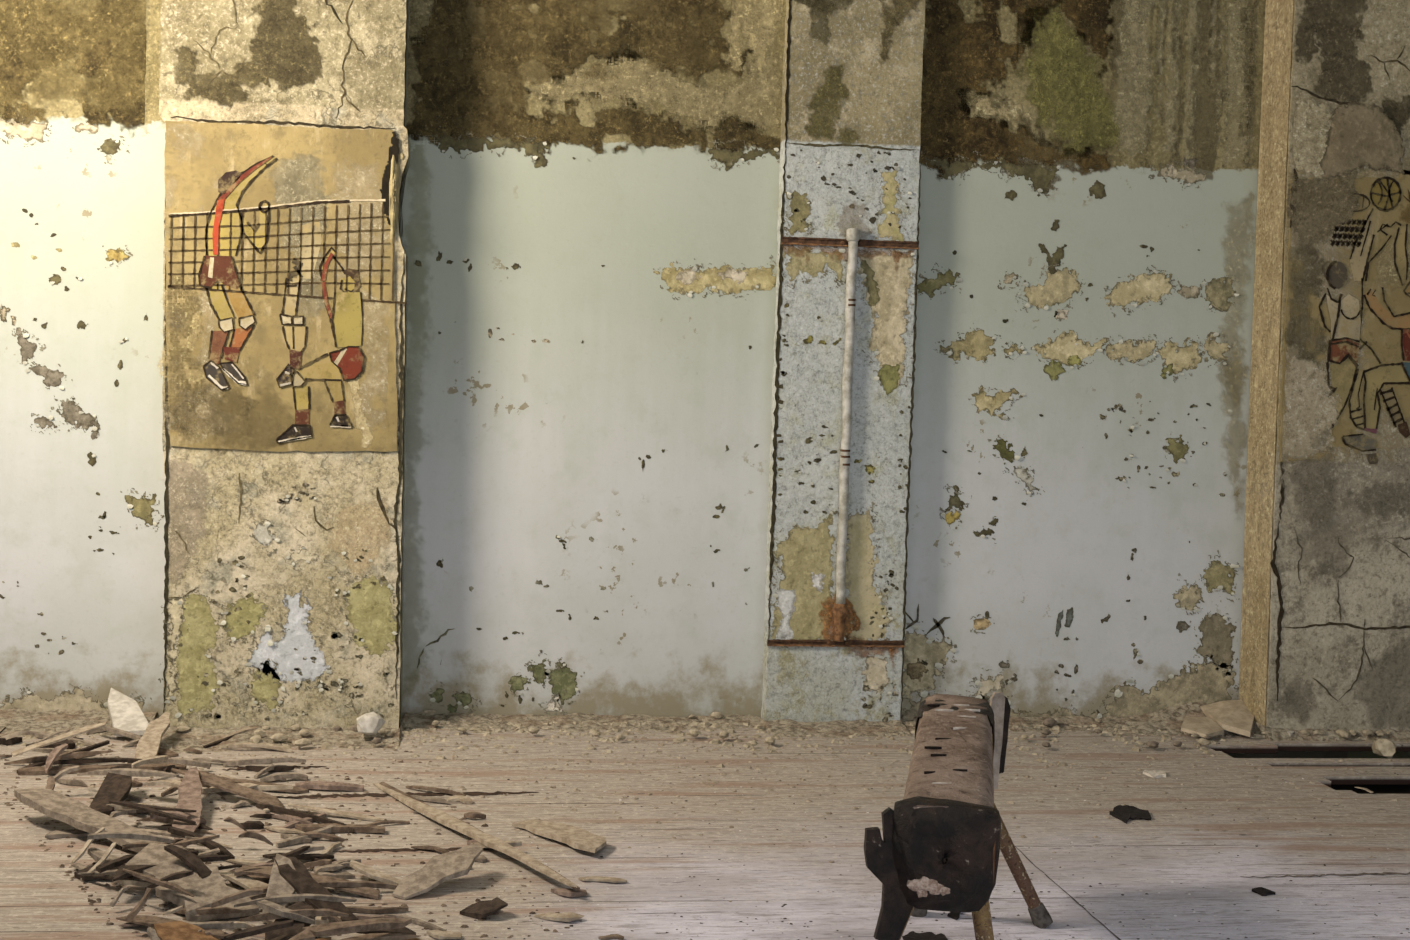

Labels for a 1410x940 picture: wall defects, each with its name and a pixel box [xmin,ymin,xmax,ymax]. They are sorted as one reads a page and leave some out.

peeling [0,303,100,467]
crack [171,0,394,129]
peeling [429,126,550,168]
leakage [328,0,858,719]
peeling [653,139,973,404]
peeling [919,150,1069,201]
peeling [933,220,1239,383]
leakage [880,0,1410,726]
peeling [130,519,402,721]
rust [819,594,898,658]
peeling [768,425,1240,722]
crack [1270,462,1410,702]